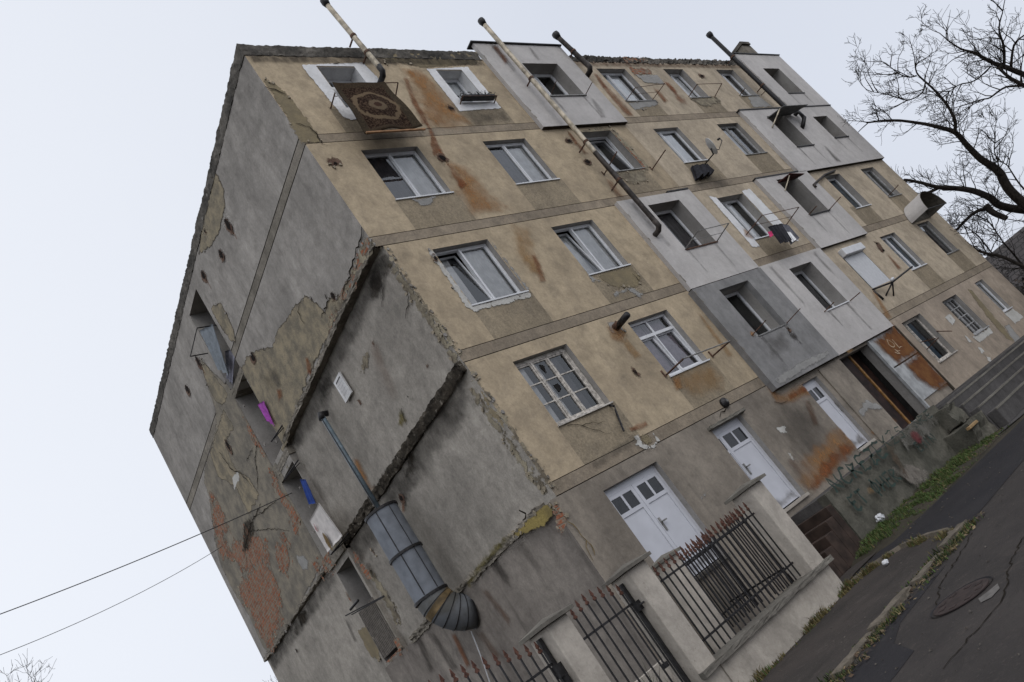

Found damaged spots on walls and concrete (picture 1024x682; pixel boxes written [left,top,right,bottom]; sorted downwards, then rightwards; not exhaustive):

flaking render [264,77,322,144]
rust [406,70,464,154]
flaking render [198,174,233,263]
rust [875,294,946,389]
flaking render [195,227,465,663]
spalling [469,371,569,538]